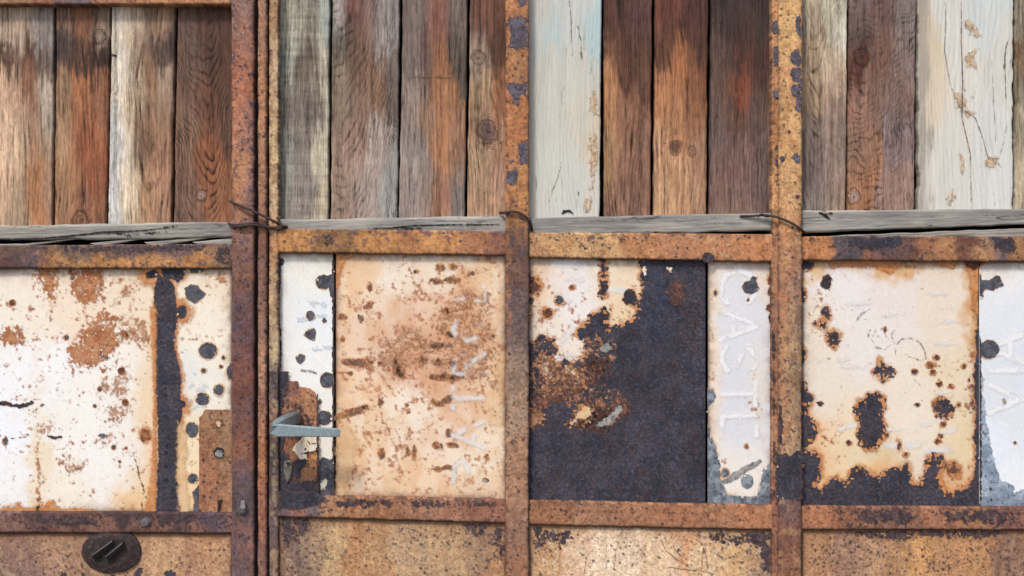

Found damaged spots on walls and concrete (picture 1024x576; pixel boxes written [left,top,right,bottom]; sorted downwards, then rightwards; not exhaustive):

peeling [964,19,981,69]
spalling [529,275,576,319]
spalling [622,289,638,308]
rust [0,325,26,347]
rust [338,263,498,407]
rust [0,423,94,511]
rust [32,268,192,512]
rust [334,397,384,495]
rust [432,429,459,449]
peeling [576,405,623,427]
spalling [707,389,716,413]
peeling [708,427,783,504]